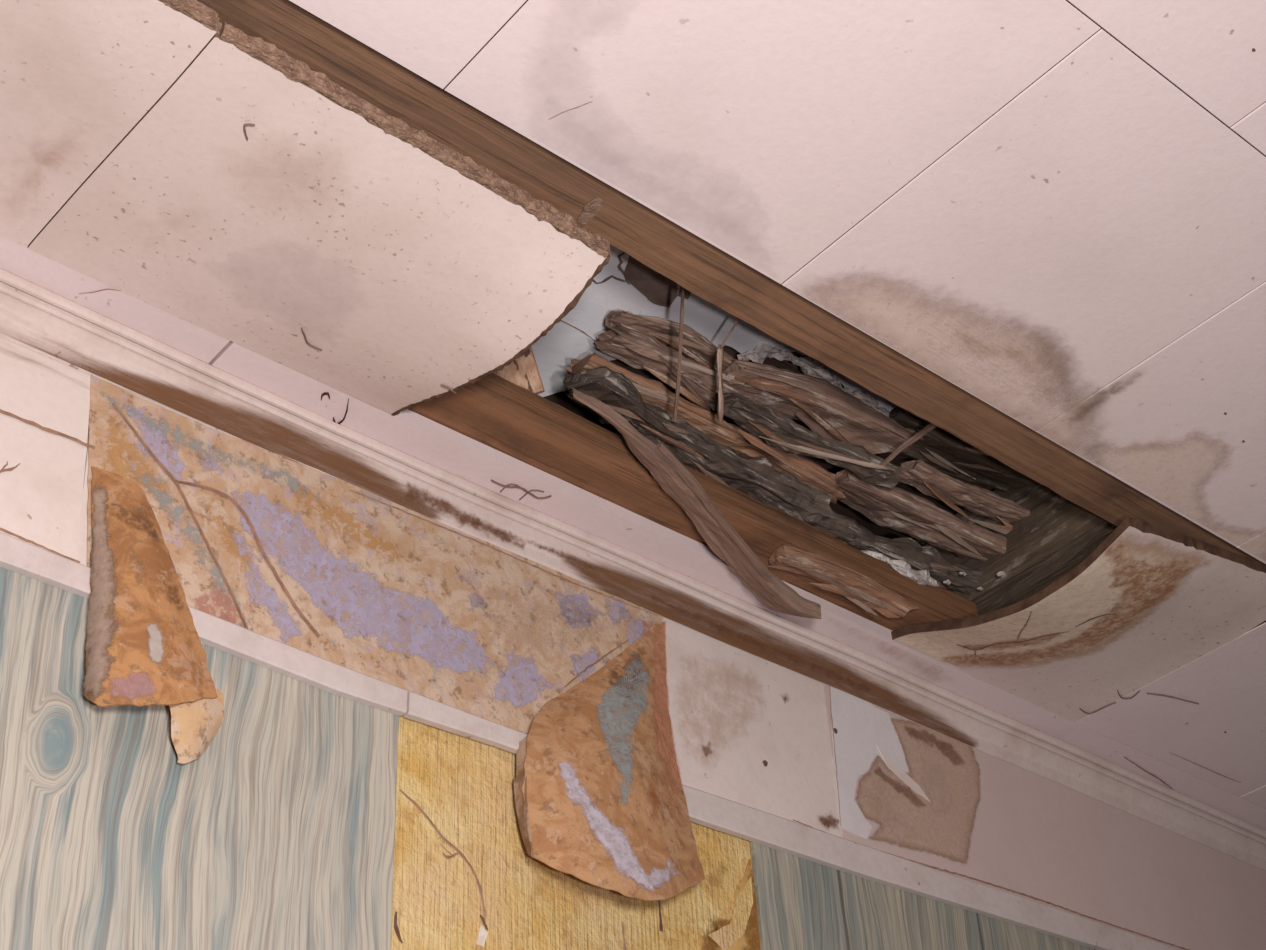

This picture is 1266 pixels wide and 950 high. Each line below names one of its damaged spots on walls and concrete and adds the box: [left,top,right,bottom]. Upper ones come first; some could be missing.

peeling [593,252,691,308]
damp [896,538,1199,666]
peeling [830,687,931,839]